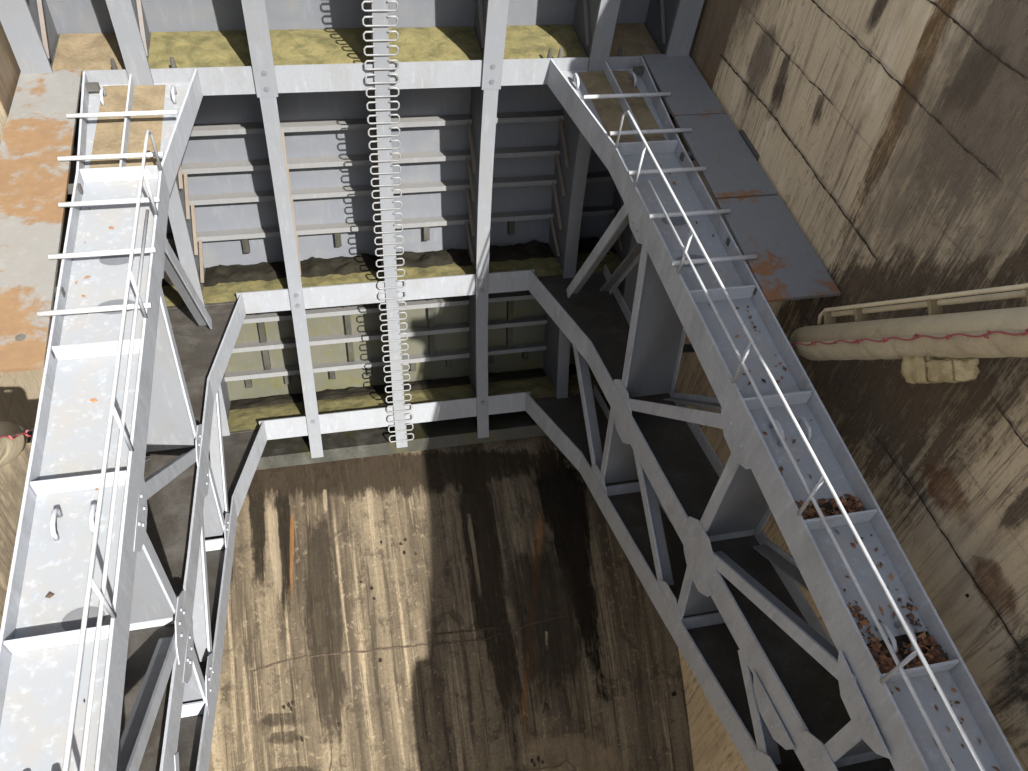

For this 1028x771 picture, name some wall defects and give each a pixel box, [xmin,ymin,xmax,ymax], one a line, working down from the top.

leakage [745,30,791,113]
crack [755,21,834,105]
crack [719,54,878,262]
leakage [776,0,1028,337]
crack [812,0,1003,183]
rust [859,0,958,205]
crack [927,0,1028,79]
leakage [796,354,1028,529]
crack [993,400,1028,448]
leakage [248,444,608,759]
crack [868,428,1027,659]
leakage [990,636,1028,747]